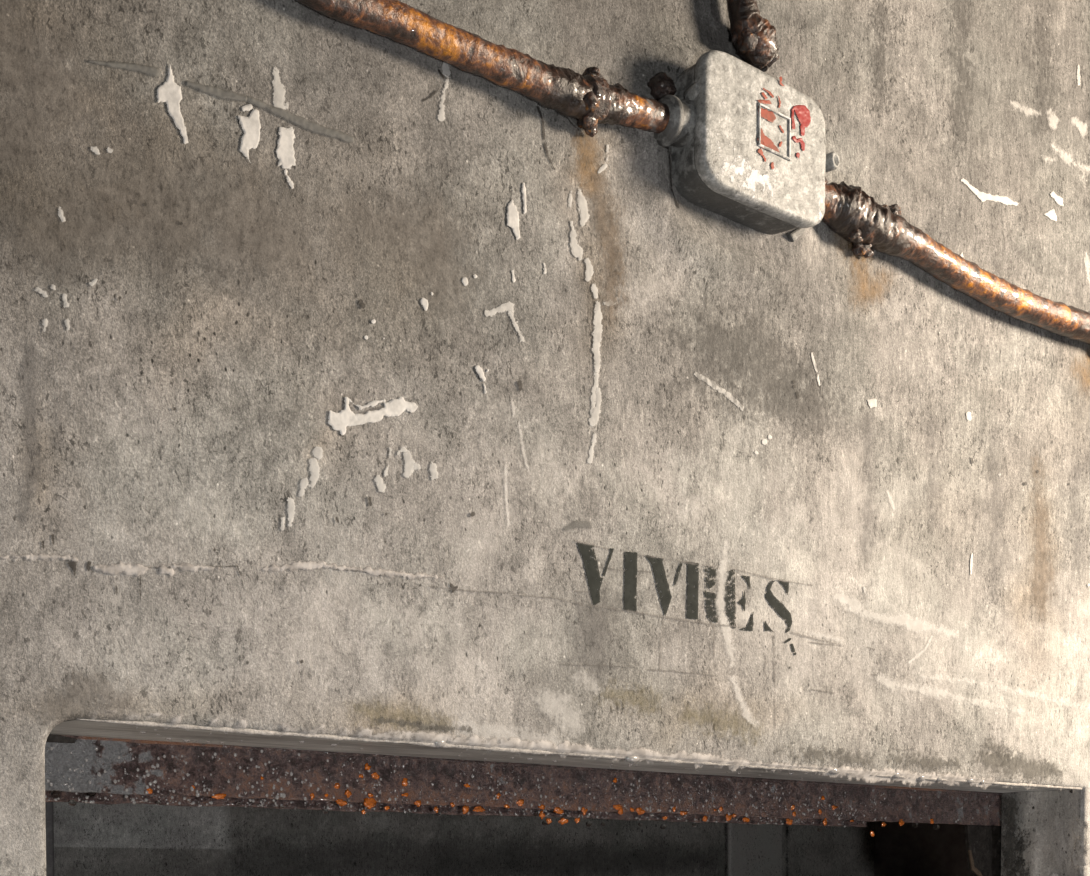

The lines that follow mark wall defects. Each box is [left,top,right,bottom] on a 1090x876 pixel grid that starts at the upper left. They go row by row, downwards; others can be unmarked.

corrosion [310,783,352,806]
corrosion [361,793,390,814]
corrosion [433,802,485,814]
corrosion [538,805,588,825]
corrosion [613,804,646,815]
corrosion [702,806,750,823]